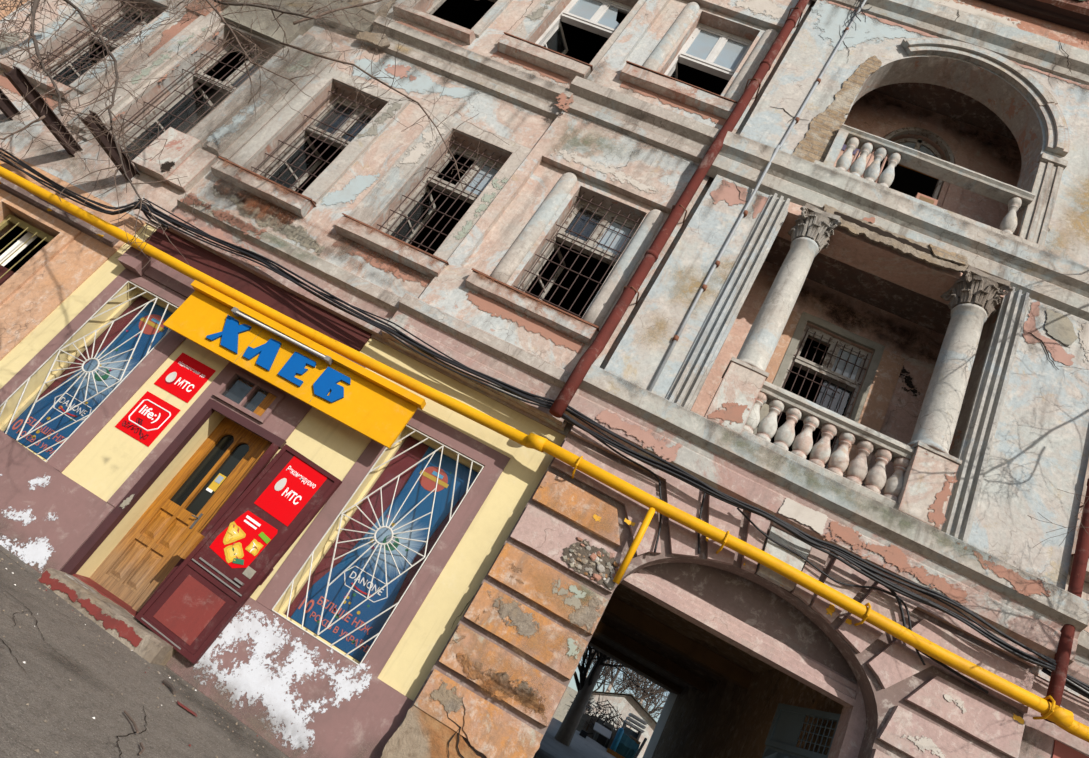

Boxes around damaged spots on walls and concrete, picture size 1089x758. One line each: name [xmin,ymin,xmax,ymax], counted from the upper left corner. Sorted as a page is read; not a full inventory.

flaking render [351,31,479,137]
flaking render [792,0,939,163]
flaking render [710,179,768,218]
flaking render [1023,301,1089,366]
peeling [596,409,682,462]
peeling [28,476,50,490]
spalling [488,590,540,638]
spalling [552,537,621,659]
peeling [779,498,968,604]
peeling [956,542,1056,597]
peeling [193,605,374,754]
crack [444,706,464,758]